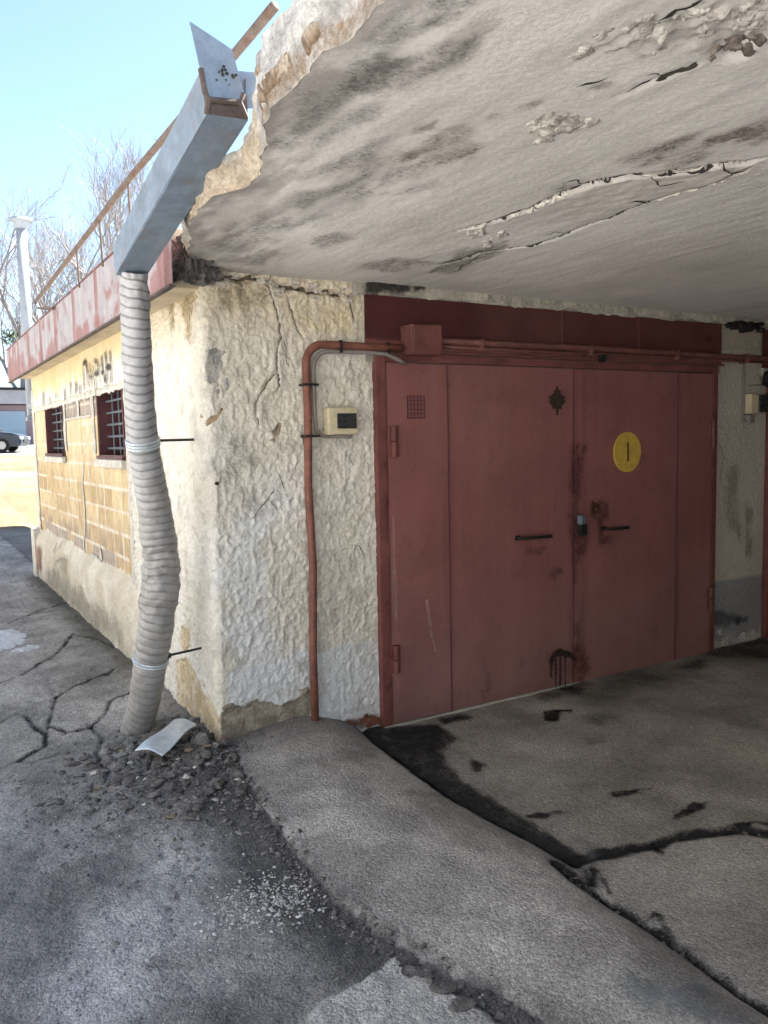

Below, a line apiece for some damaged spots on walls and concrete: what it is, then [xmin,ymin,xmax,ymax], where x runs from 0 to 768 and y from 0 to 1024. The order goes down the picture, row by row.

spalling [301,21,321,56]
peeling [568,0,768,63]
spalling [253,51,293,112]
spalling [525,111,600,145]
damp [634,121,768,165]
crack [444,158,761,270]
damp [367,260,426,294]
peeling [204,348,229,394]
crack [209,271,354,425]